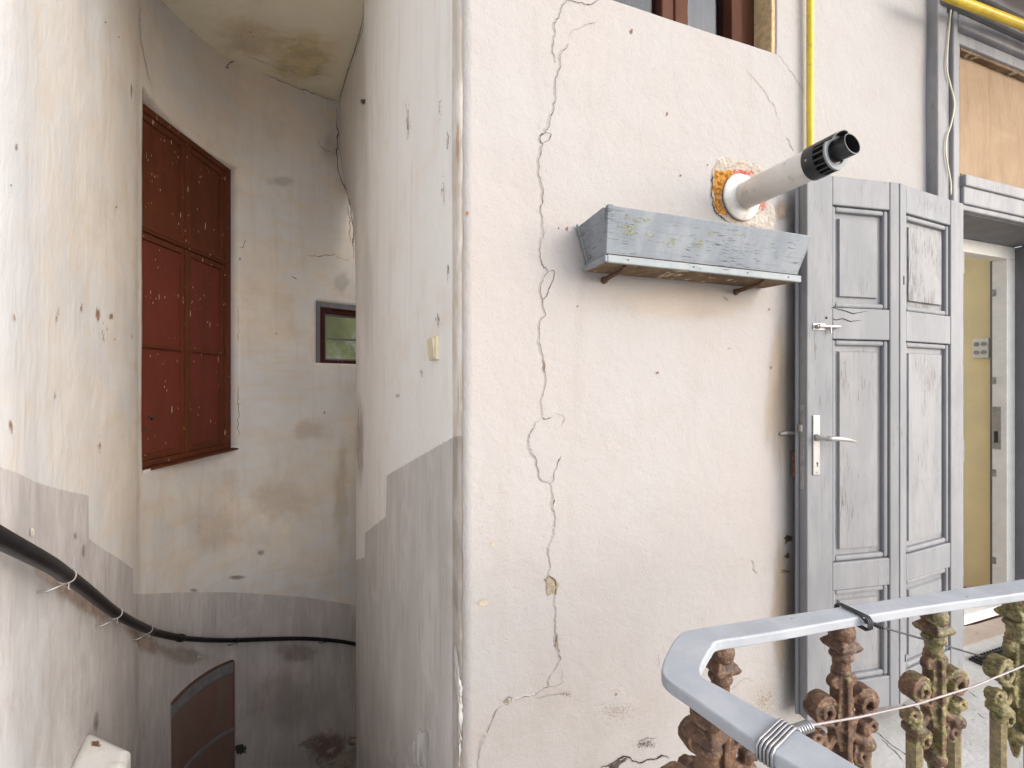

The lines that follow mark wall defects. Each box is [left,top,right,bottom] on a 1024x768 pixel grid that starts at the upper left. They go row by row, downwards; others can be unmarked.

crack [226,20,363,259]
crack [477,0,597,768]
flaking render [544,575,559,595]
crack [601,738,669,768]